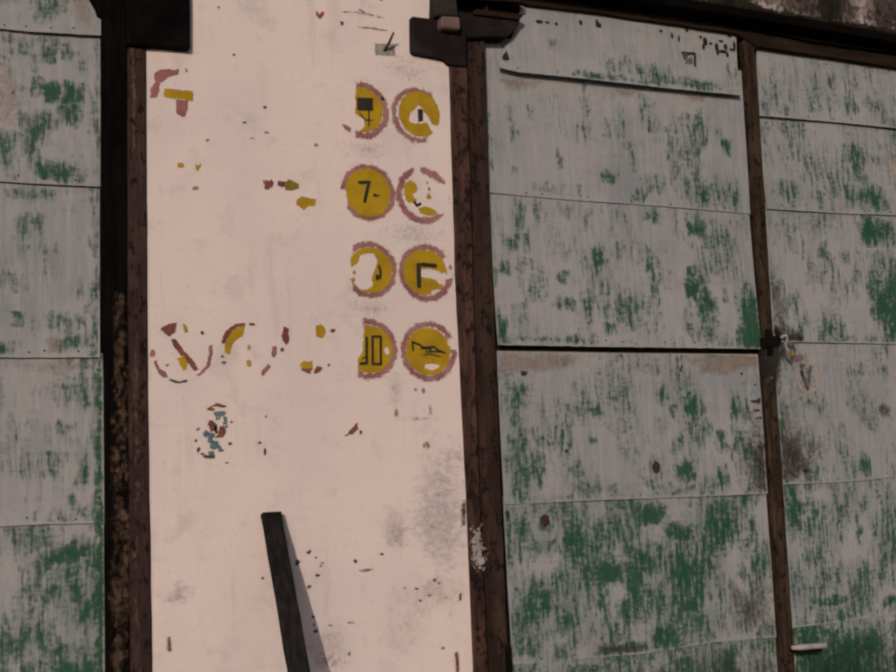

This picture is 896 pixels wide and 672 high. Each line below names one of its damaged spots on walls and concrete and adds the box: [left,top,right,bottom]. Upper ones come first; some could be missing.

leakage [747,0,896,30]
peeling [0,76,98,215]
peeling [150,322,255,383]
peeling [261,327,289,376]
peeling [541,242,661,344]
peeling [635,111,761,348]
peeling [762,77,896,372]
peeling [0,309,140,672]
peeling [195,403,233,459]
peeling [469,524,487,571]
peeling [501,355,775,672]
peeling [779,408,896,672]